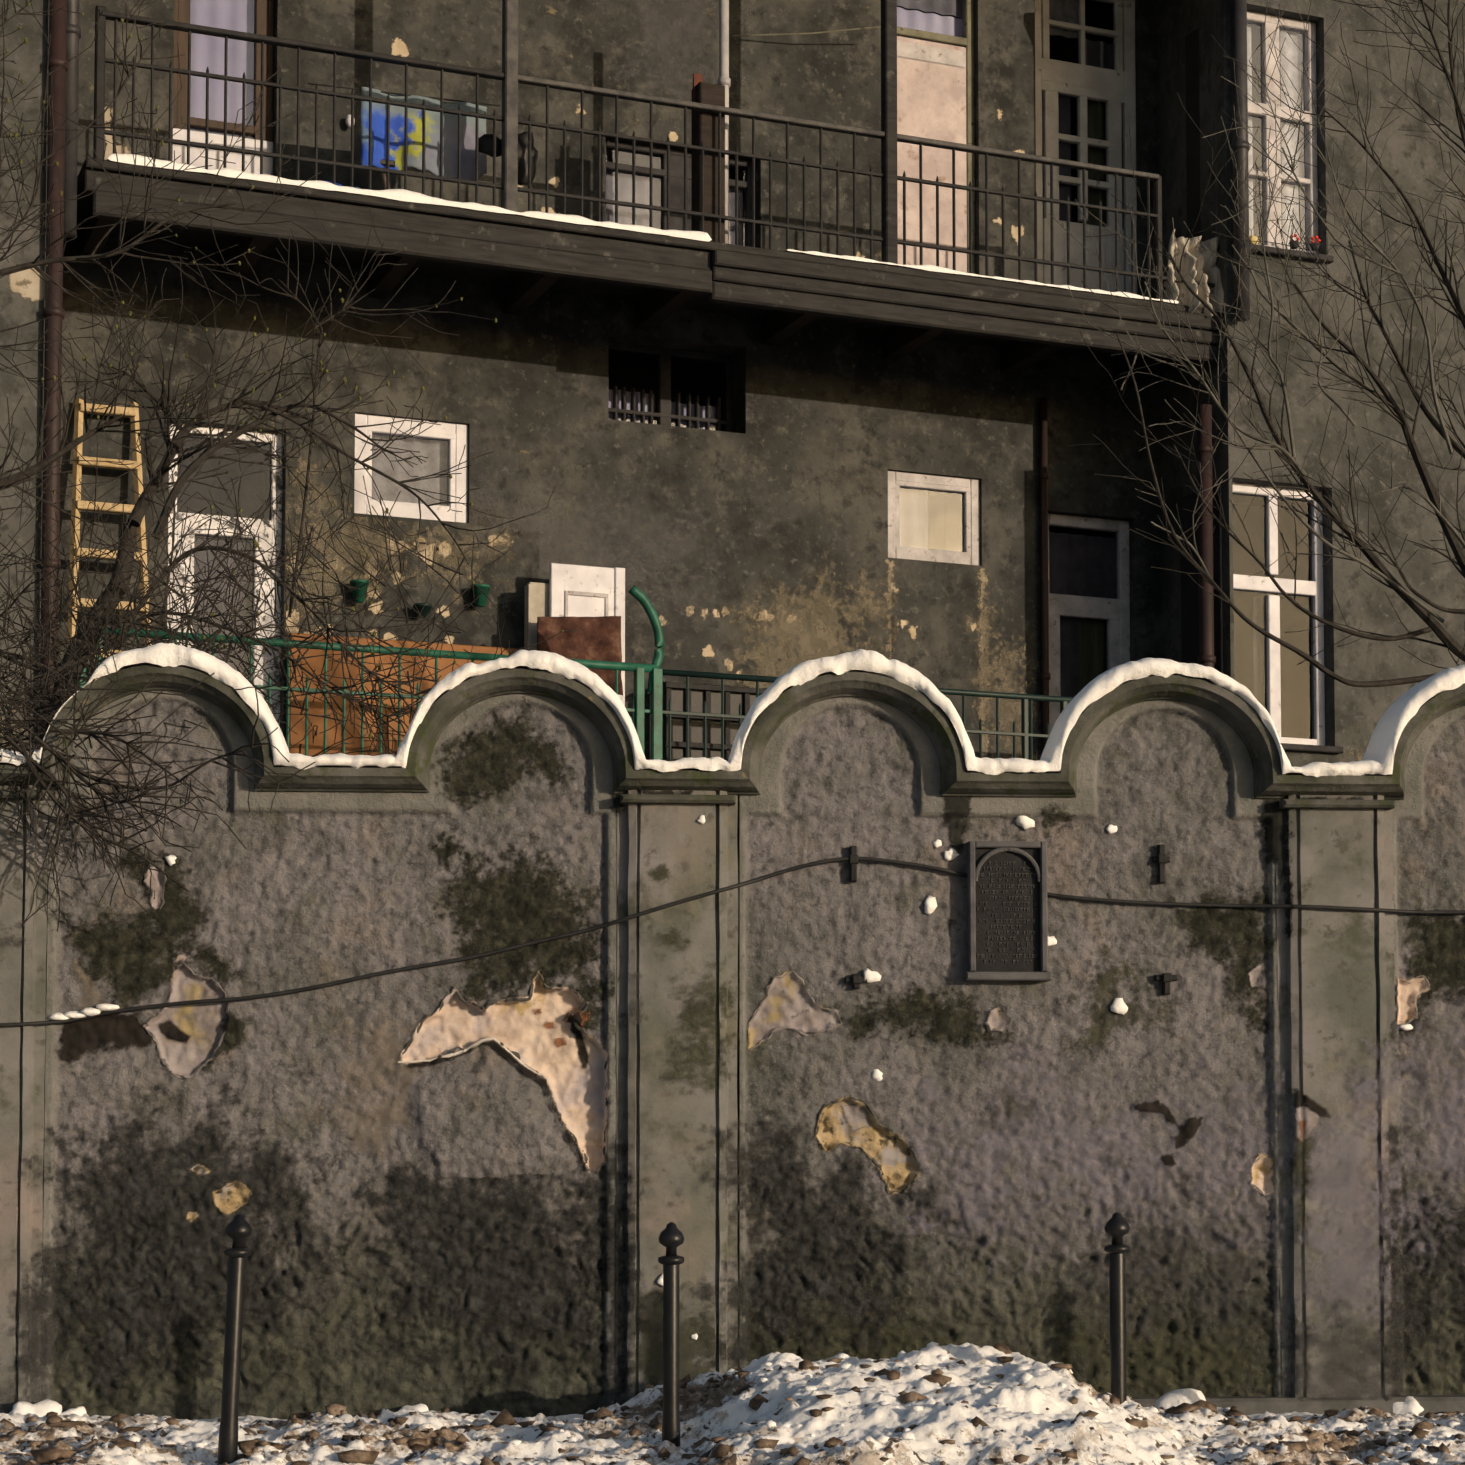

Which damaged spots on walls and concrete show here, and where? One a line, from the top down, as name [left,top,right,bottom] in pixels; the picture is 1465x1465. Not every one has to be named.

peeling [327,537,452,640]
flaking render [48,955,251,1079]
flaking render [398,971,610,1175]
flaking render [747,970,843,1051]
flaking render [1397,975,1430,1031]
flaking render [213,1180,252,1217]
leakage [0,1083,644,1413]
leakage [692,1111,937,1362]
flaking render [813,1096,922,1194]
leakage [895,1188,962,1229]
leakage [1069,1123,1465,1401]
flaking render [1249,1089,1331,1232]